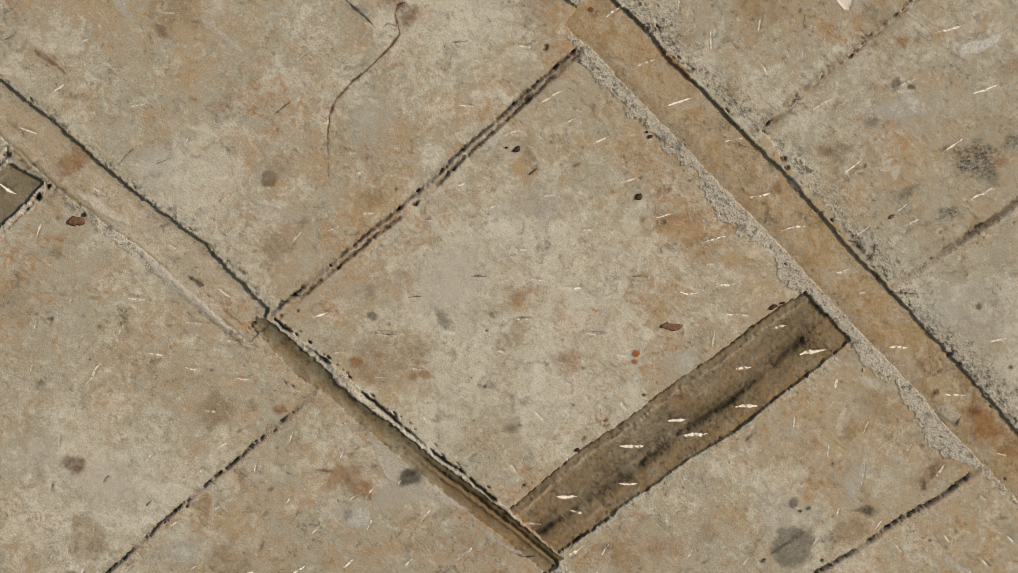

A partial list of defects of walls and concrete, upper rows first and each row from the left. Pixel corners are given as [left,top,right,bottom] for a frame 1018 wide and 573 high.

spalling [836,0,852,10]
crack [327,0,403,136]
leakage [957,136,1017,178]
leakage [773,529,811,566]